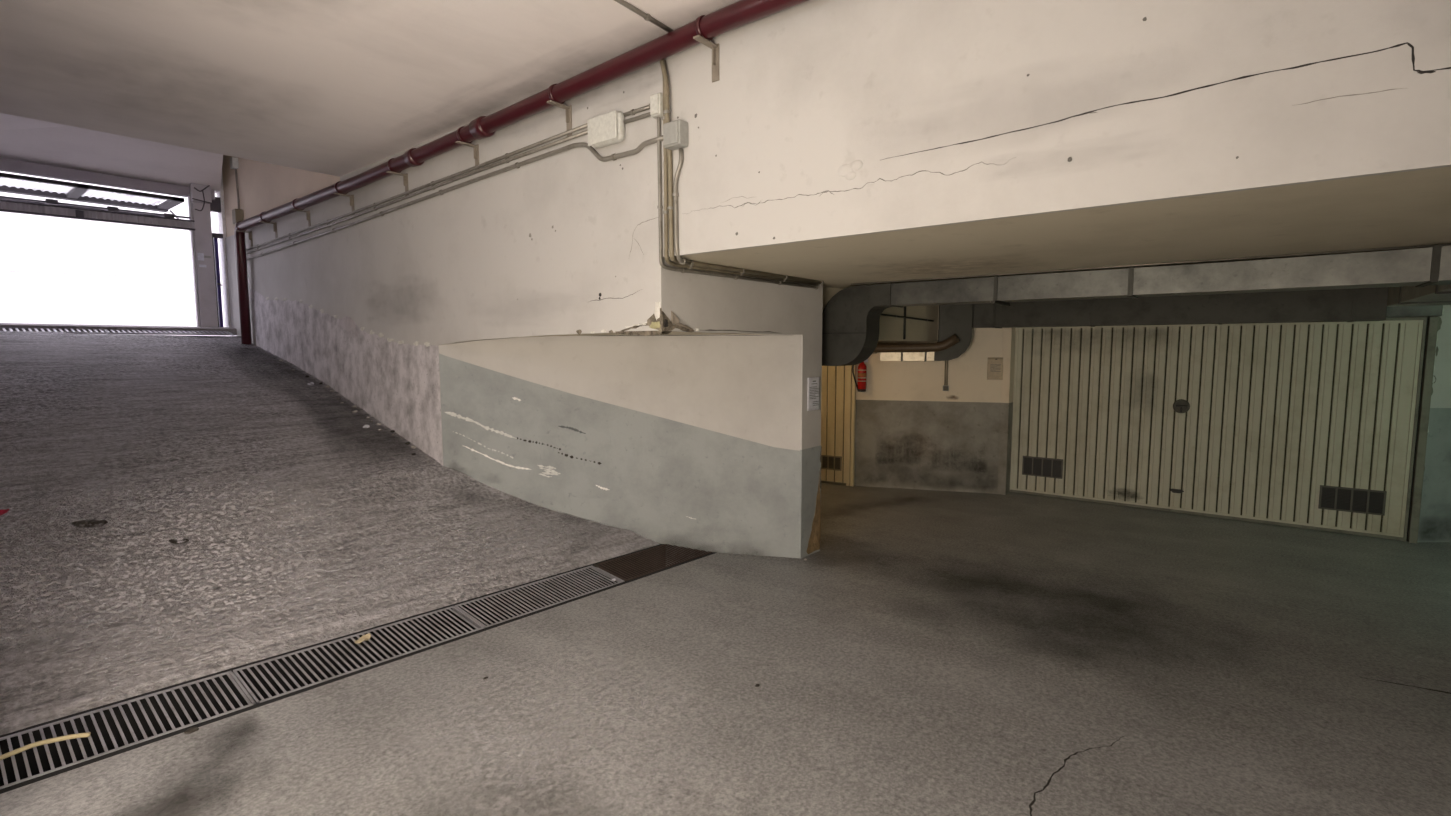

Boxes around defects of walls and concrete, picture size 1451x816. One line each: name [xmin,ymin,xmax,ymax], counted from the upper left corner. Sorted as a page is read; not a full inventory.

crack [629,42,1451,256]
crack [1029,736,1124,816]